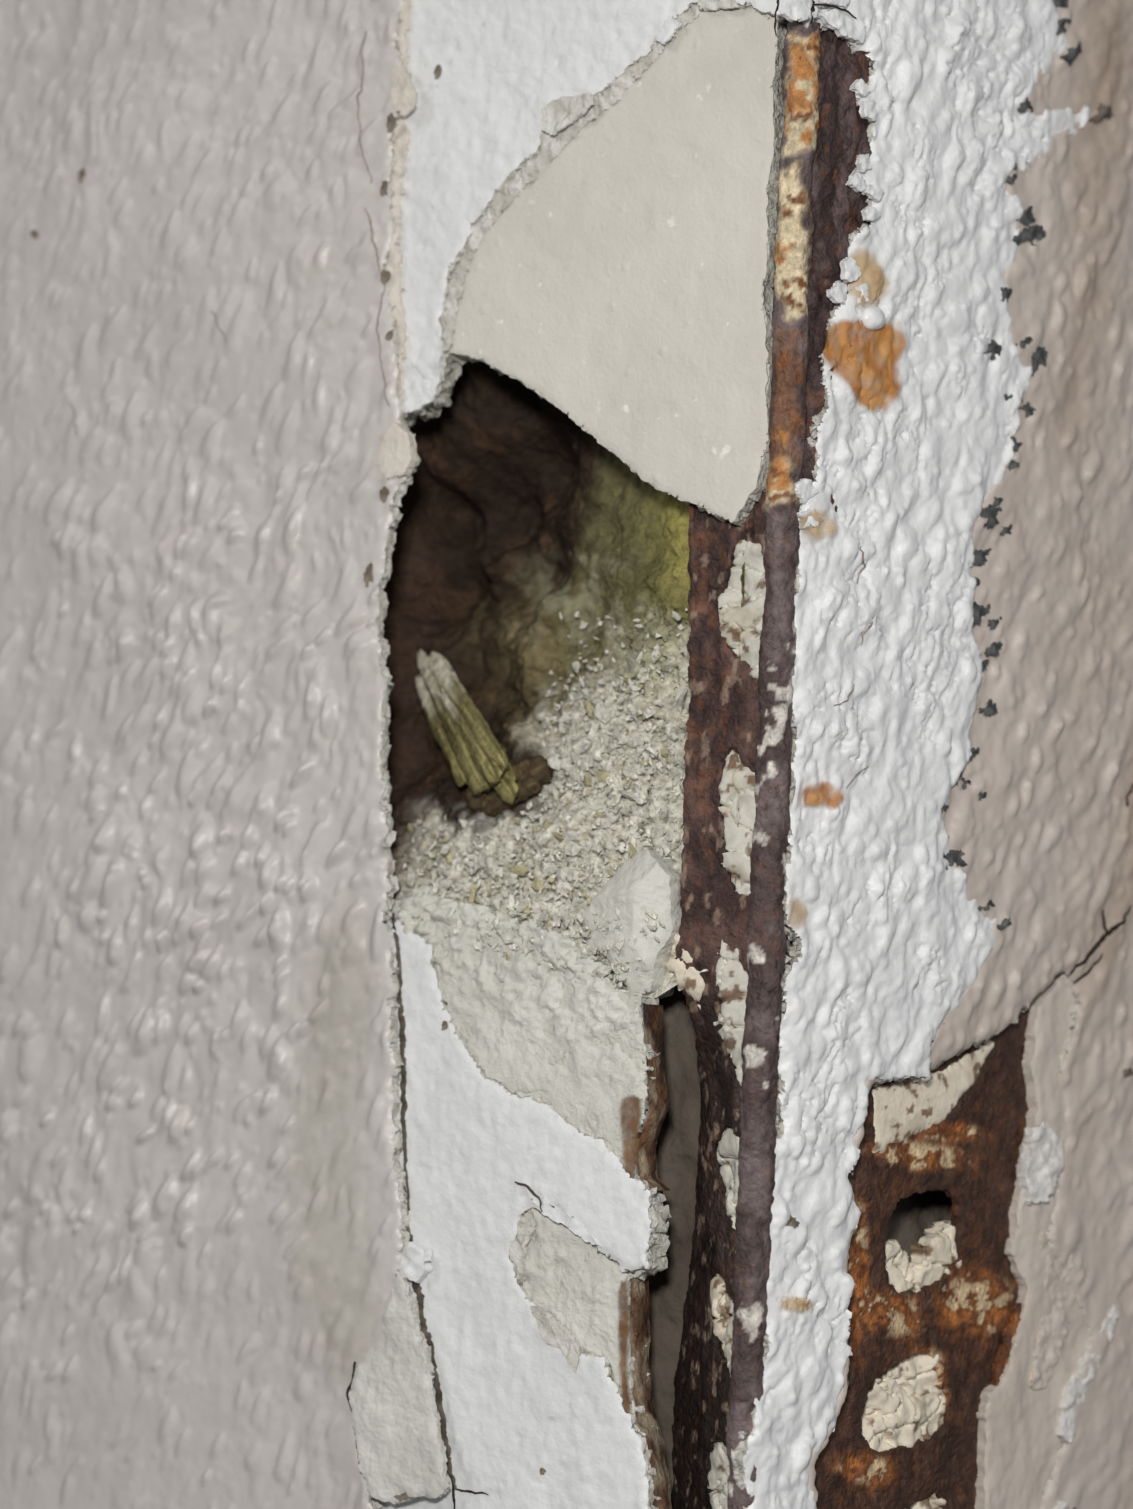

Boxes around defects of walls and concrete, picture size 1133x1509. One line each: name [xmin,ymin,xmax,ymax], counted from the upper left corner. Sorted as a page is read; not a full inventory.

peeling [846,153,884,222]
corrosion [823,253,905,409]
spalling [363,0,869,1151]
corrosion [803,782,843,807]
crack [392,913,413,1242]
corrosion [621,1004,670,1191]
crack [346,1361,359,1455]
peeling [348,1241,451,1504]
crack [412,1281,489,1509]
peeling [508,1182,635,1414]
corrosion [619,1276,672,1509]
peeling [974,977,1119,1509]